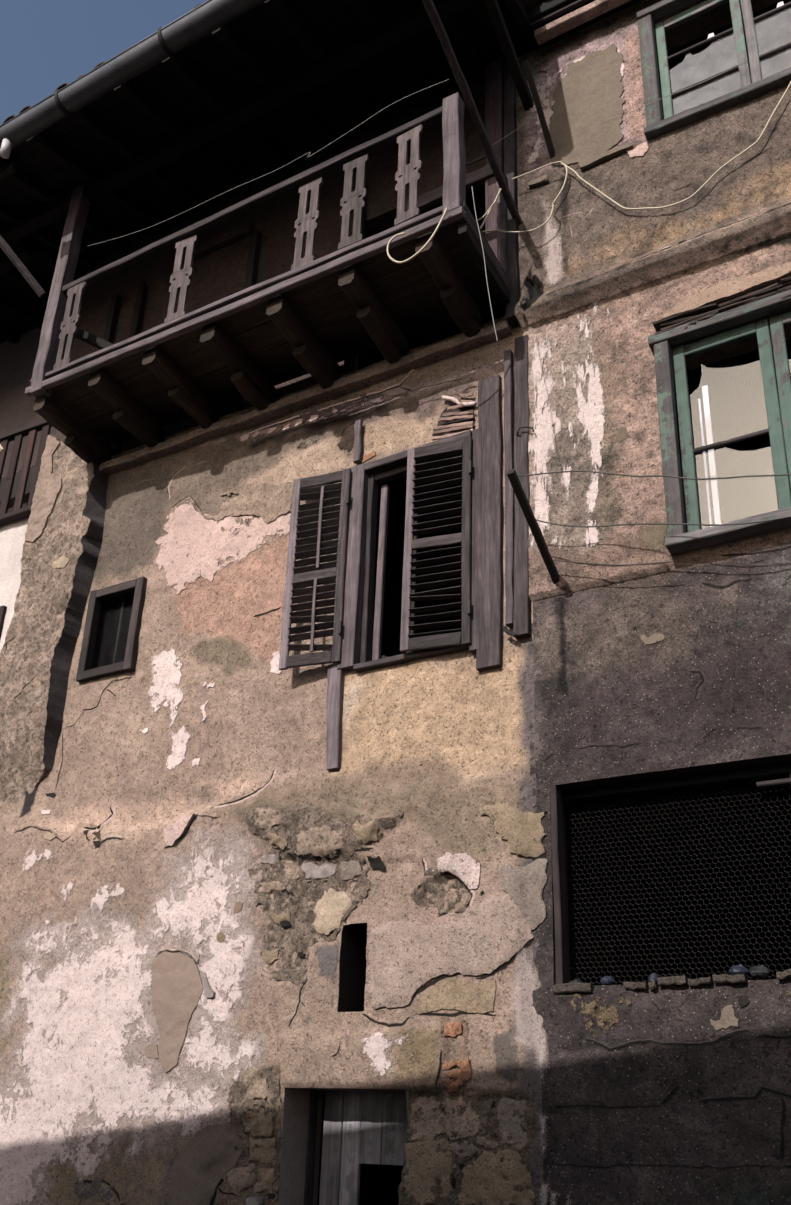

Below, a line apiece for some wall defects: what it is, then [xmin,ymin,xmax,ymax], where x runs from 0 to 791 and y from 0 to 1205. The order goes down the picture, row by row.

peeling [527,56,585,163]
spalling [627,142,648,158]
peeling [528,297,609,548]
peeling [155,482,293,595]
peeling [147,648,200,770]
peeling [200,682,215,722]
crack [14,802,124,843]
crack [165,769,277,848]
spalling [367,856,384,869]
peeling [0,830,263,1205]
peeling [362,1032,405,1076]